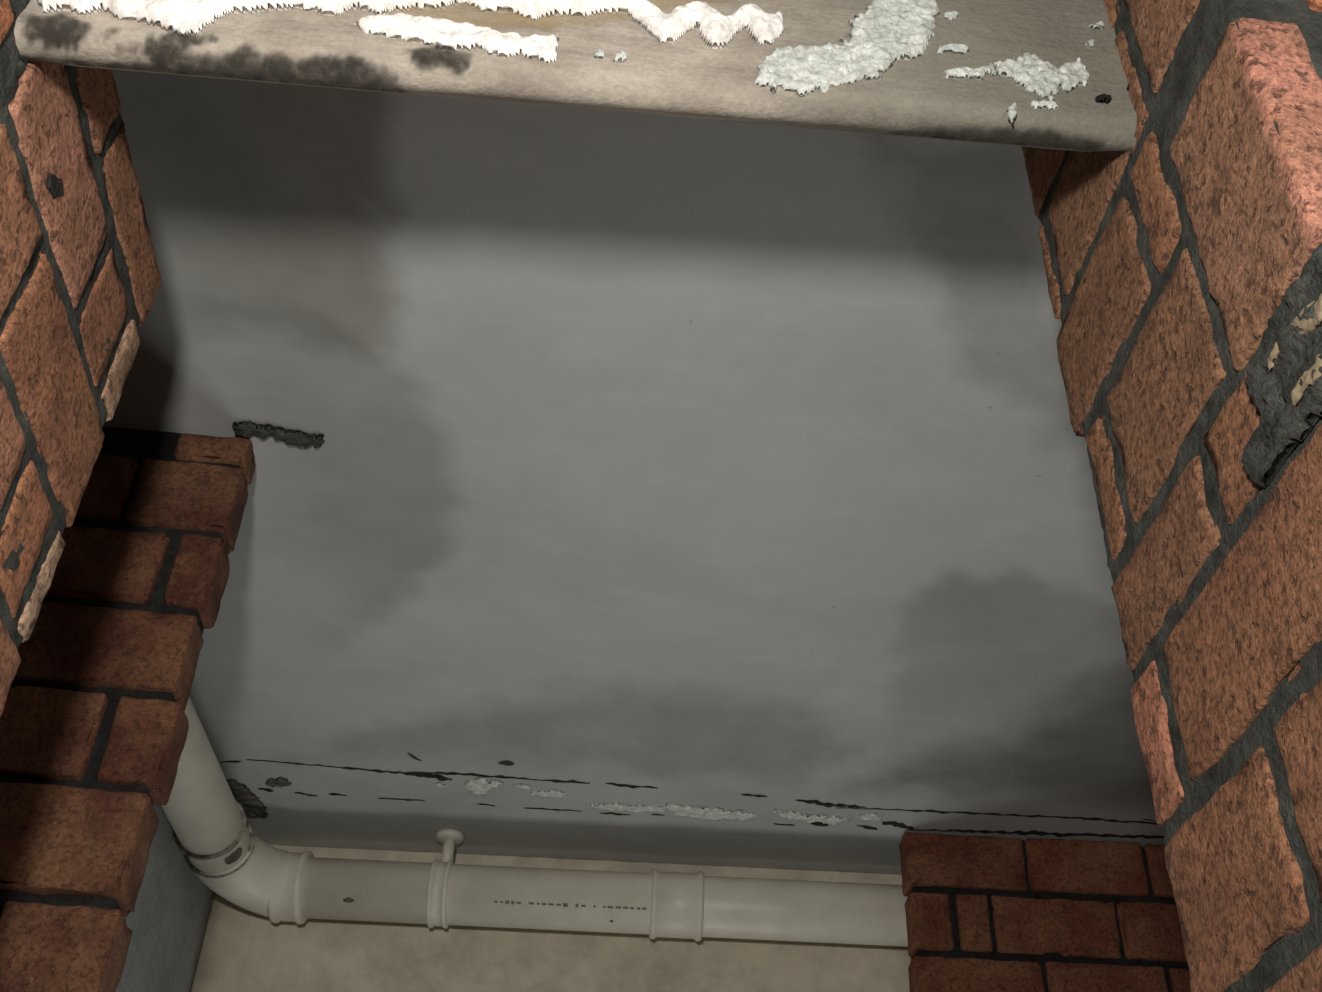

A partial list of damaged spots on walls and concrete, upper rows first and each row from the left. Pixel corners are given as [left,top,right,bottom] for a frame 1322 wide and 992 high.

leakage [18,13,406,93]
leakage [411,42,469,72]
spalling [1291,293,1322,335]
spalling [1267,342,1279,371]
spalling [1291,354,1322,407]
peeling [226,777,292,818]
peeling [436,777,565,798]
peeling [589,802,757,821]
peeling [773,809,884,825]